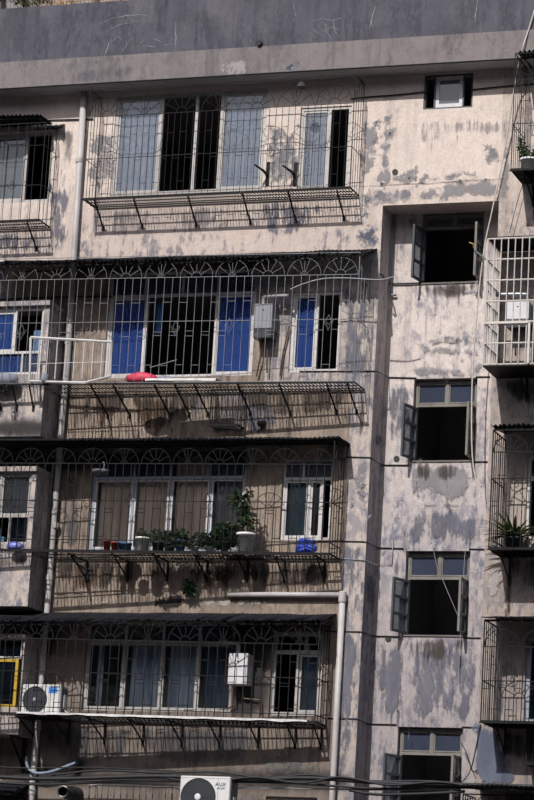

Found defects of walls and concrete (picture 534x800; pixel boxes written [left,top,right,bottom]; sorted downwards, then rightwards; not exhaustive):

water stain [263,203,319,243]
water stain [403,502,476,549]
water stain [139,595,189,611]
water stain [202,599,265,613]
water stain [379,647,403,727]
water stain [413,649,475,727]
water stain [471,723,514,791]